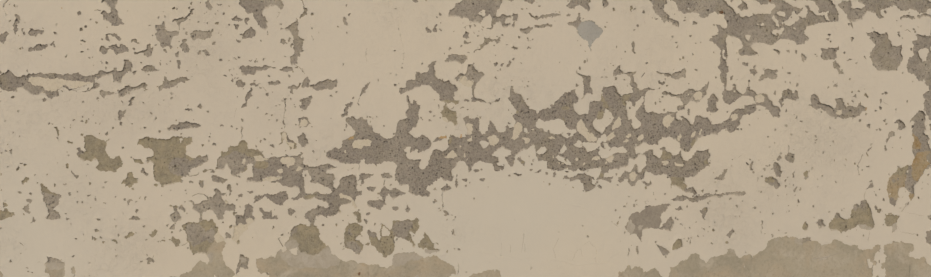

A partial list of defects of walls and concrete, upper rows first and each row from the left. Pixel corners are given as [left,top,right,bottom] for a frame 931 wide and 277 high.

peeling [75,196,146,244]
peeling [121,172,138,190]
peeling [0,0,284,185]
flaking render [618,26,931,277]